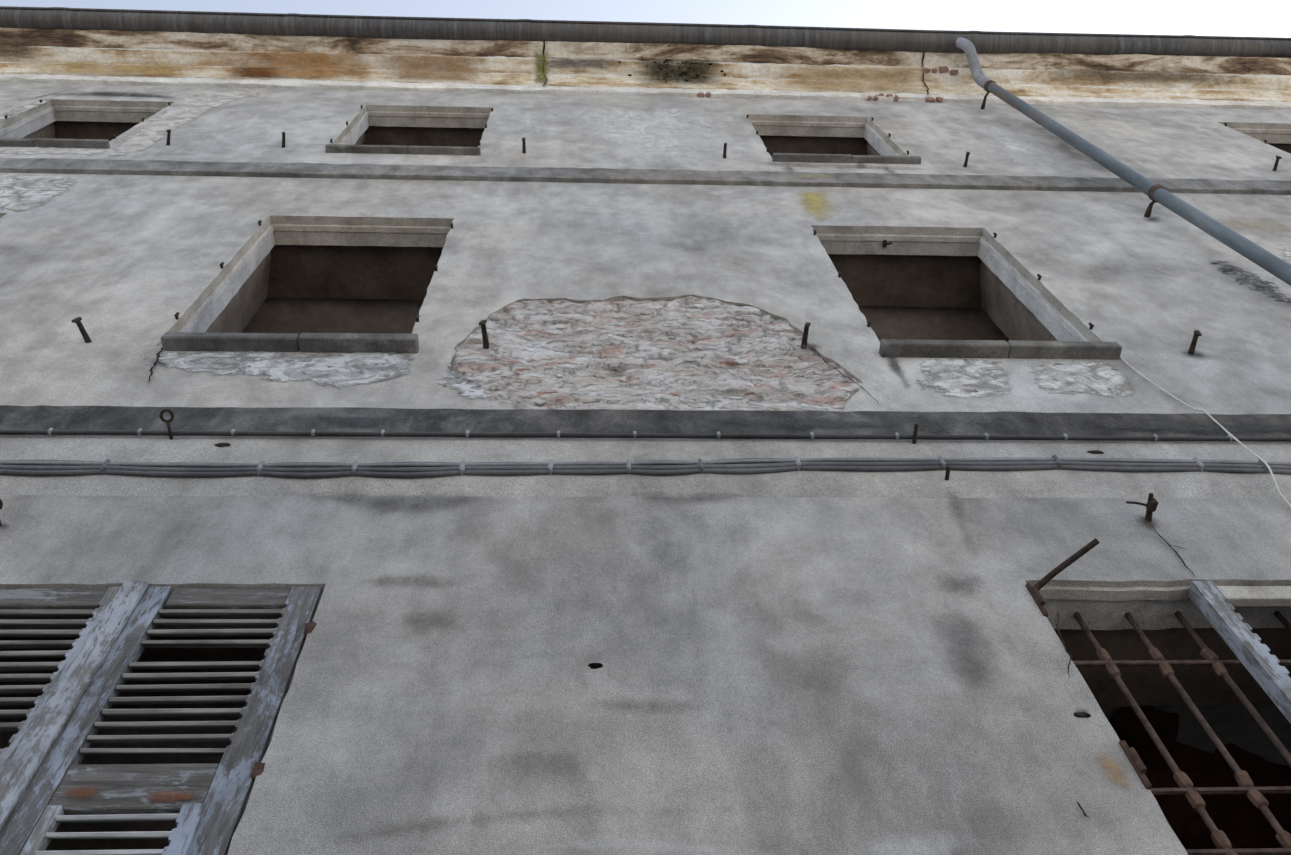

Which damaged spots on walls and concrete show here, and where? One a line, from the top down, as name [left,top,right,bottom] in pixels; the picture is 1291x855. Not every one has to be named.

damp [0,42,31,57]
damp [53,62,177,74]
damp [803,68,907,89]
crack [921,52,929,95]
damp [1059,69,1218,82]
flaking render [0,174,77,211]
flaking render [1212,260,1291,303]
flaking render [144,351,413,389]
flaking render [437,295,863,411]
flaking render [918,358,1010,398]
flaking render [1031,361,1135,397]